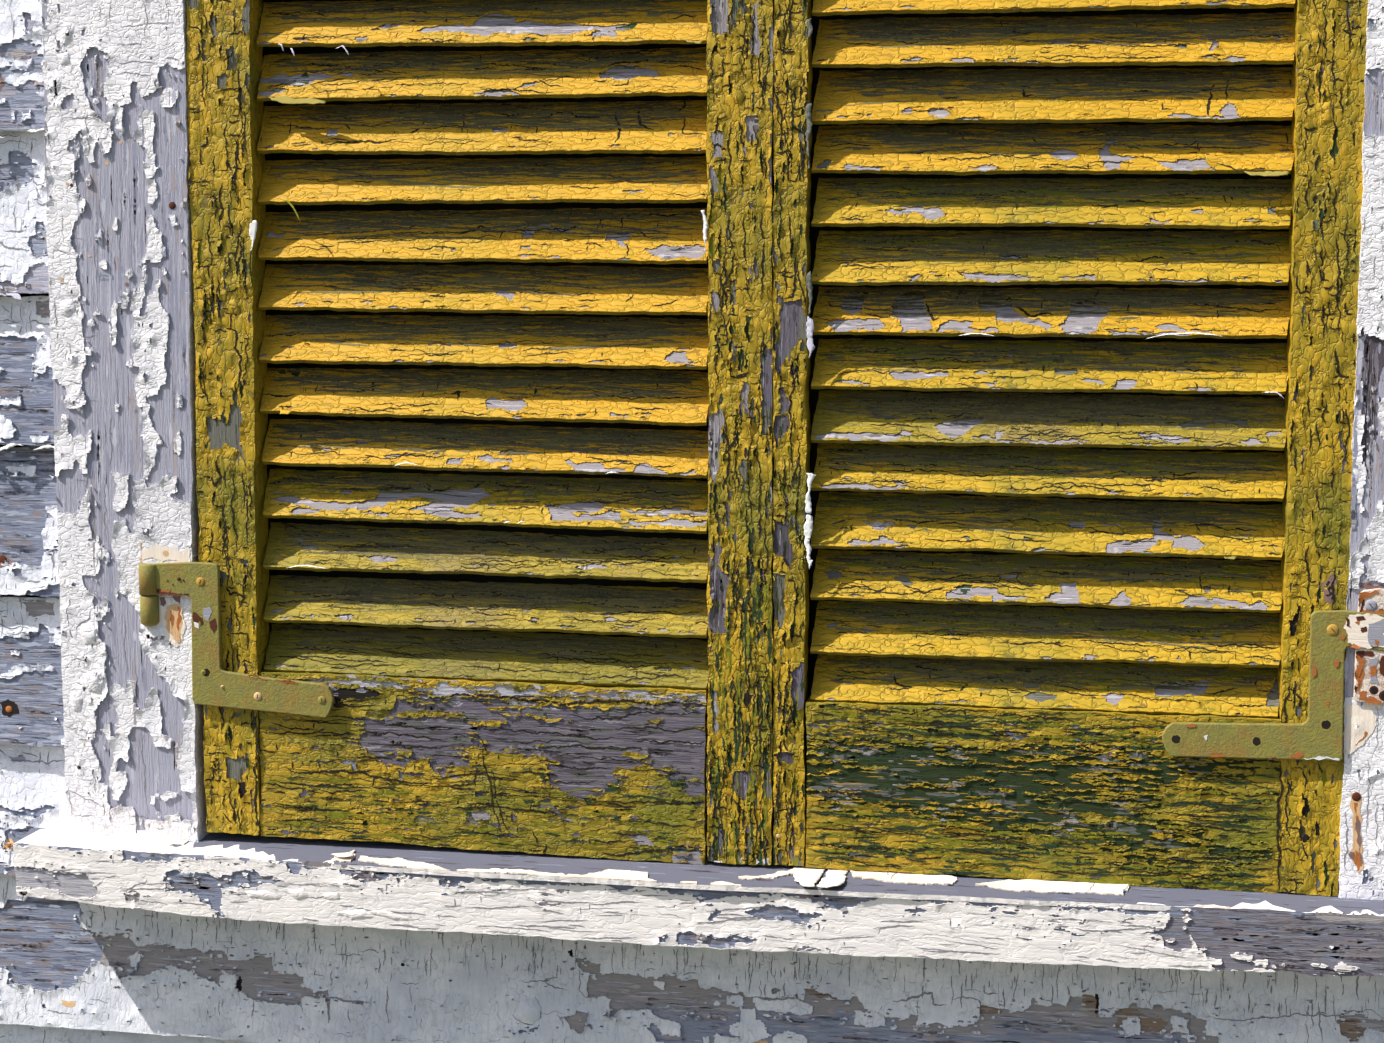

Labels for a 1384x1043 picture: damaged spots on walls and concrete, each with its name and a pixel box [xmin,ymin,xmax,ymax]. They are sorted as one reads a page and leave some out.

peeling [188,0,355,113]
peeling [355,14,643,42]
crack [0,0,310,740]
crack [197,0,1384,894]
peeling [935,418,1088,445]
peeling [248,482,508,523]
peeling [1069,517,1205,553]
peeling [946,574,1082,604]
corrosion [1320,574,1338,604]
corrosion [1334,582,1384,705]
corrosion [1348,793,1364,873]
peeling [509,942,1239,1043]